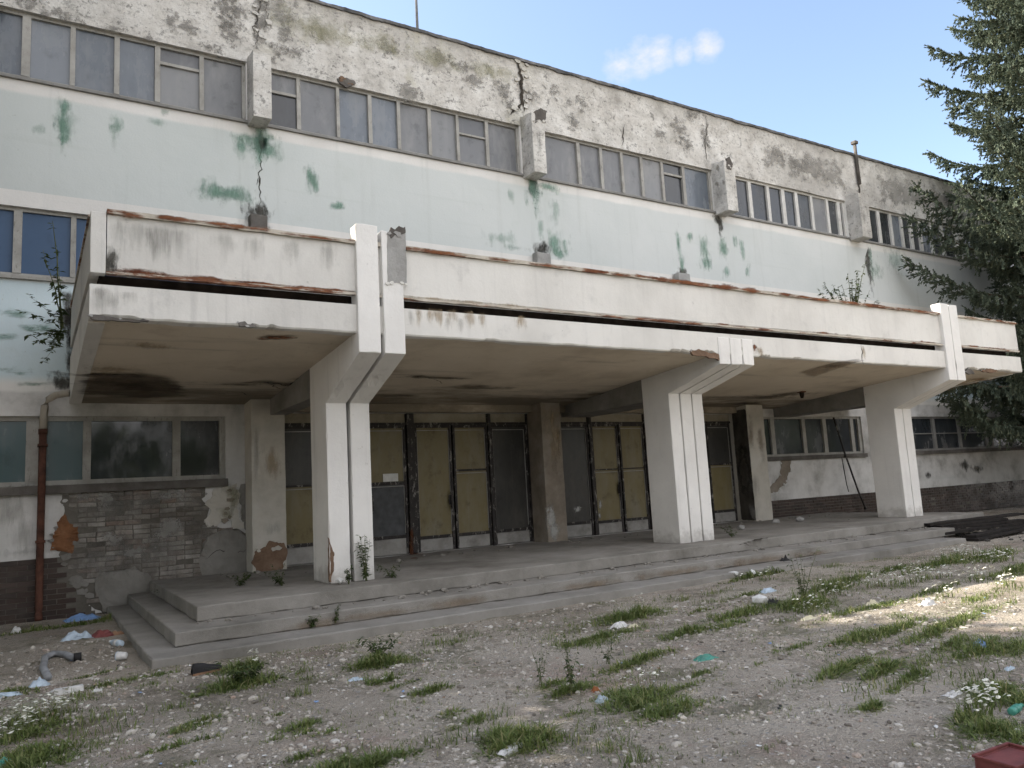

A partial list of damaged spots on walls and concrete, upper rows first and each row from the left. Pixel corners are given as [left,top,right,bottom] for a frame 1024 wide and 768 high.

crack [252,0,272,45]
crack [511,59,532,114]
crack [256,132,264,204]
rust [158,215,268,231]
rust [406,247,456,256]
rust [588,270,694,284]
rust [718,284,759,293]
water stain [82,374,181,398]
spalling [770,460,793,493]
flaking render [49,483,246,614]
spalling [251,540,288,572]